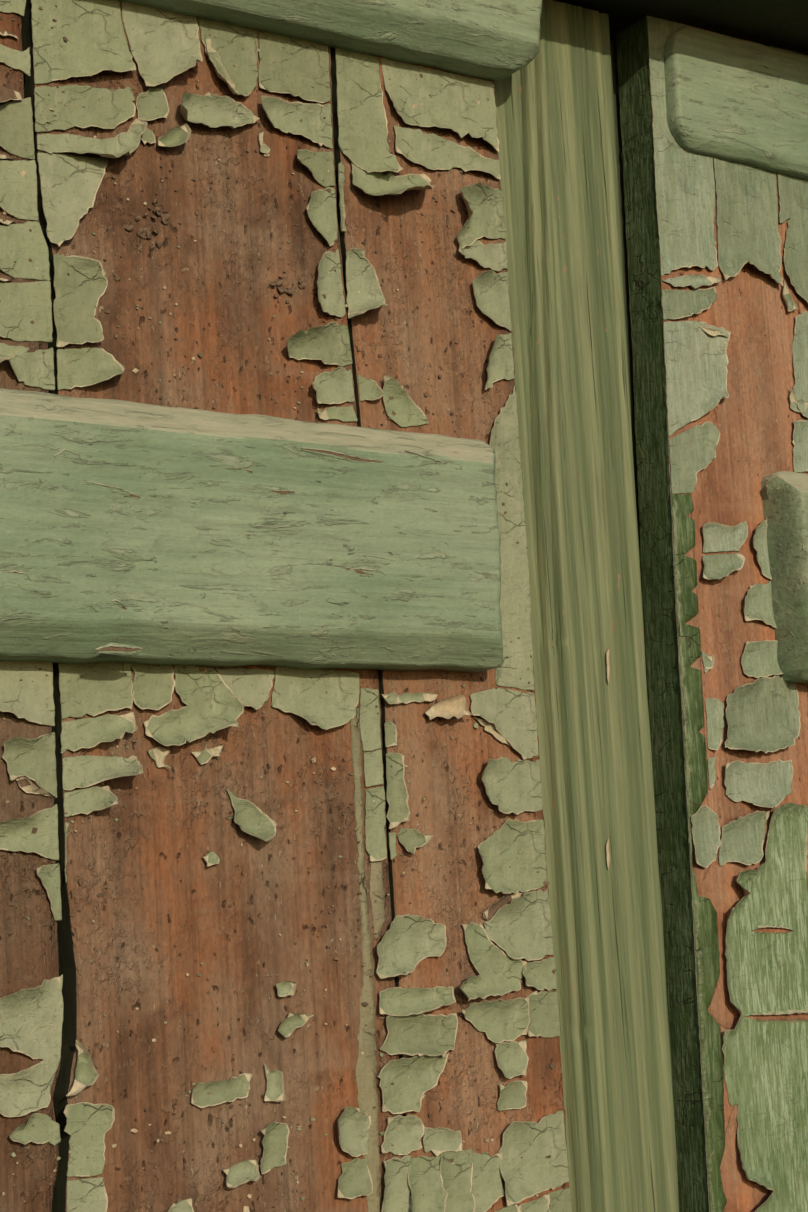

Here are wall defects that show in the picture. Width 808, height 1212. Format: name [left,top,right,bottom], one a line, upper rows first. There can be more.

peeling [646,15,808,1030]
peeling [0,0,572,1212]
crack [800,821,808,890]
crack [751,924,794,935]
crack [745,1004,808,1023]
peeling [720,1105,771,1212]